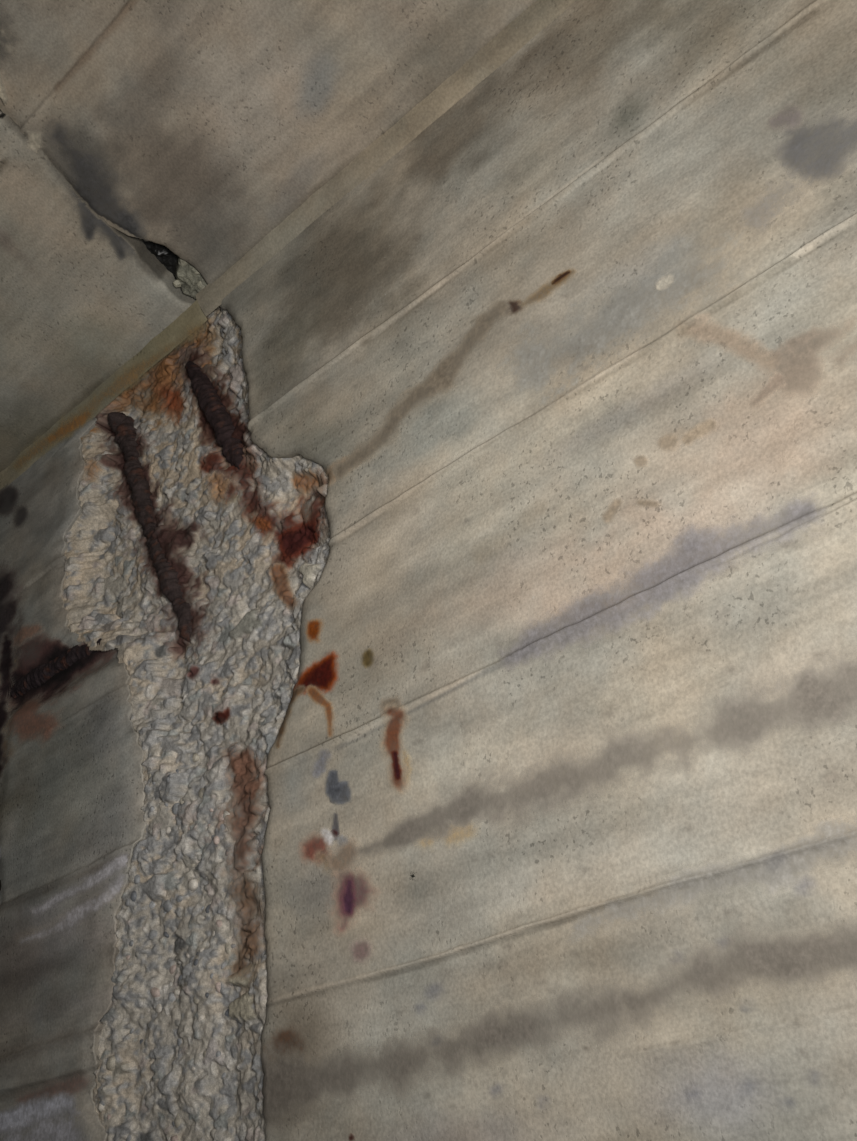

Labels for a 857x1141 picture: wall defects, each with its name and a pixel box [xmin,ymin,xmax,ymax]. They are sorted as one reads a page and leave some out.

leakage [50,122,146,260]
leakage [744,107,857,227]
mould [0,485,28,527]
rust [80,311,329,685]
crack [0,633,16,777]
rust [0,565,118,763]
spalling [11,306,330,1141]
rust [212,707,230,725]
rust [275,651,338,748]
rust [362,649,374,668]
rust [381,698,408,793]
rust [219,742,267,978]